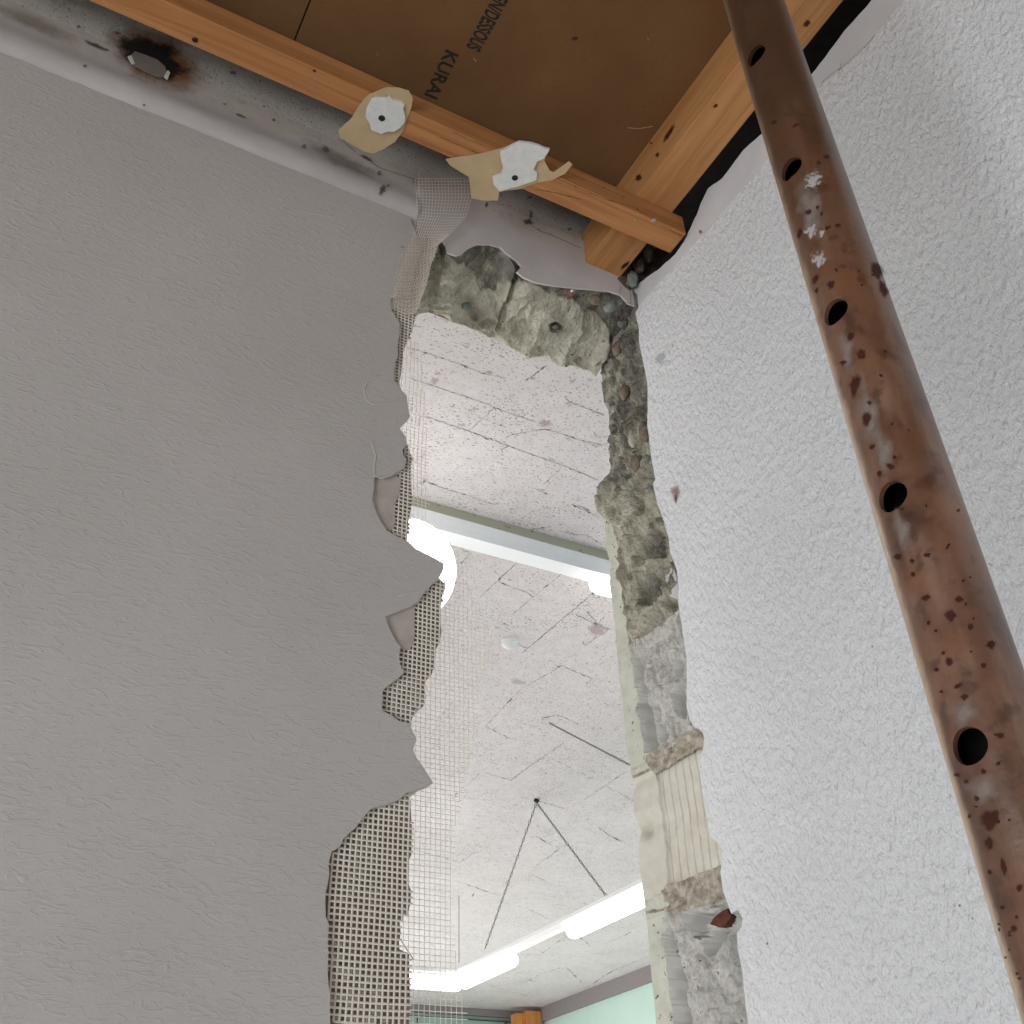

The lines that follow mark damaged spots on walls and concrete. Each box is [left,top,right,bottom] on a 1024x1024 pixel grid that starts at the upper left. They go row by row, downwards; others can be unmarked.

rust [112,33,194,86]
flaking render [617,249,667,291]
rust [858,263,889,296]
flaking render [391,232,439,384]
rust [850,377,860,396]
flaking render [372,445,413,541]
flaking render [666,559,679,599]
rust [945,596,967,621]
flaking render [382,578,446,724]
rust [968,796,1011,849]
flaking render [325,794,414,1024]